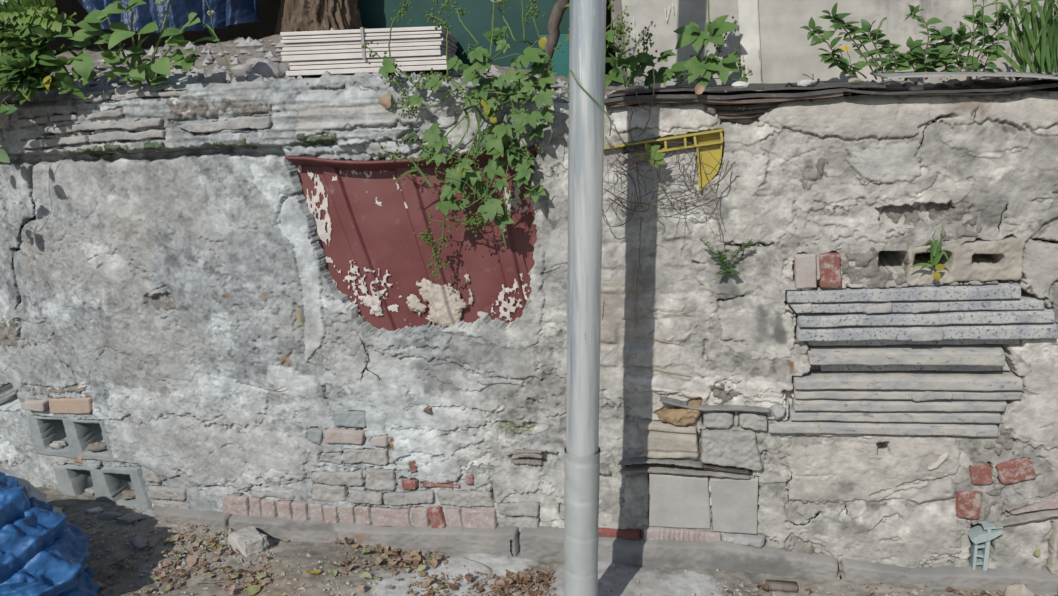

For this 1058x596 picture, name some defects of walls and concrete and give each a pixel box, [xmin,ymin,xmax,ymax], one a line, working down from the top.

crack [921,106,979,148]
crack [11,163,38,263]
peeling [353,274,474,328]
crack [359,336,381,382]